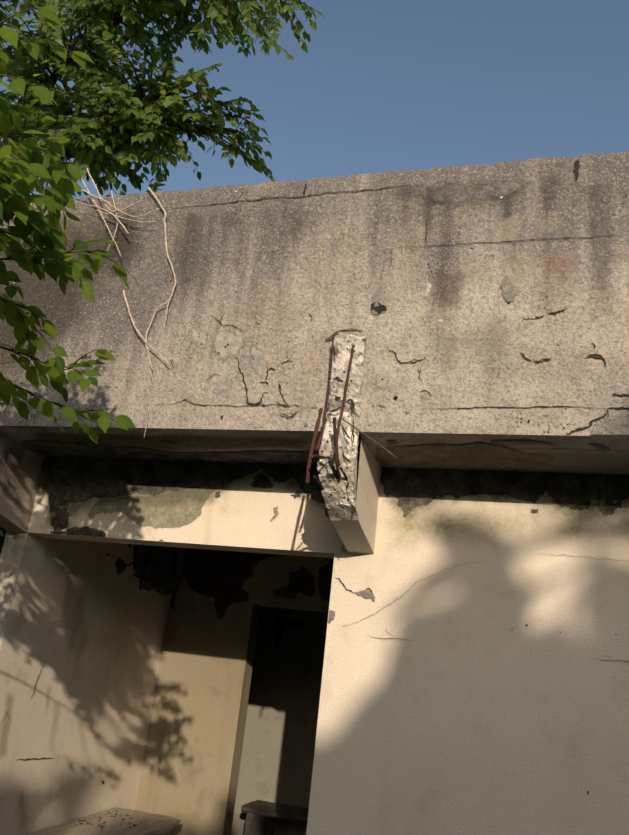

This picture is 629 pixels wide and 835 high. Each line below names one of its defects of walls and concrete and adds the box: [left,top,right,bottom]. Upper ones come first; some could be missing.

crack [572,161,580,181]
spalling [370,282,387,315]
crack [154,357,317,427]
crack [387,345,629,436]
peeling [23,328,629,537]
peeling [104,539,285,619]
peeling [273,557,335,624]
peeling [355,587,375,602]
crack [333,562,476,640]